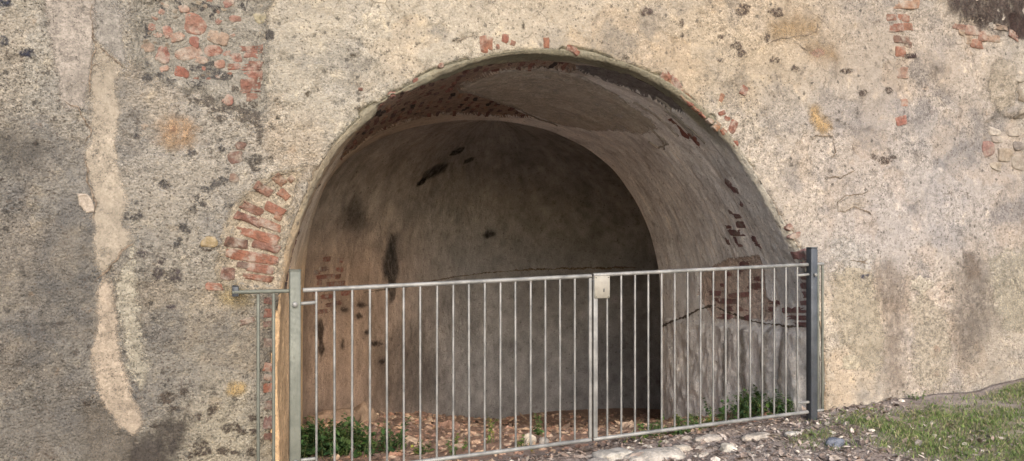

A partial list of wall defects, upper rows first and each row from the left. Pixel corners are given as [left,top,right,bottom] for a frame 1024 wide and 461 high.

spalling [128,0,274,116]
spalling [886,0,920,79]
spalling [952,23,1019,49]
water stain [948,0,1024,39]
flaking render [340,34,739,161]
spalling [895,99,908,126]
water stain [417,148,473,186]
spalling [205,142,305,348]
water stain [383,234,398,300]
spalling [698,178,806,327]
crack [663,304,802,328]
spalling [262,362,272,440]